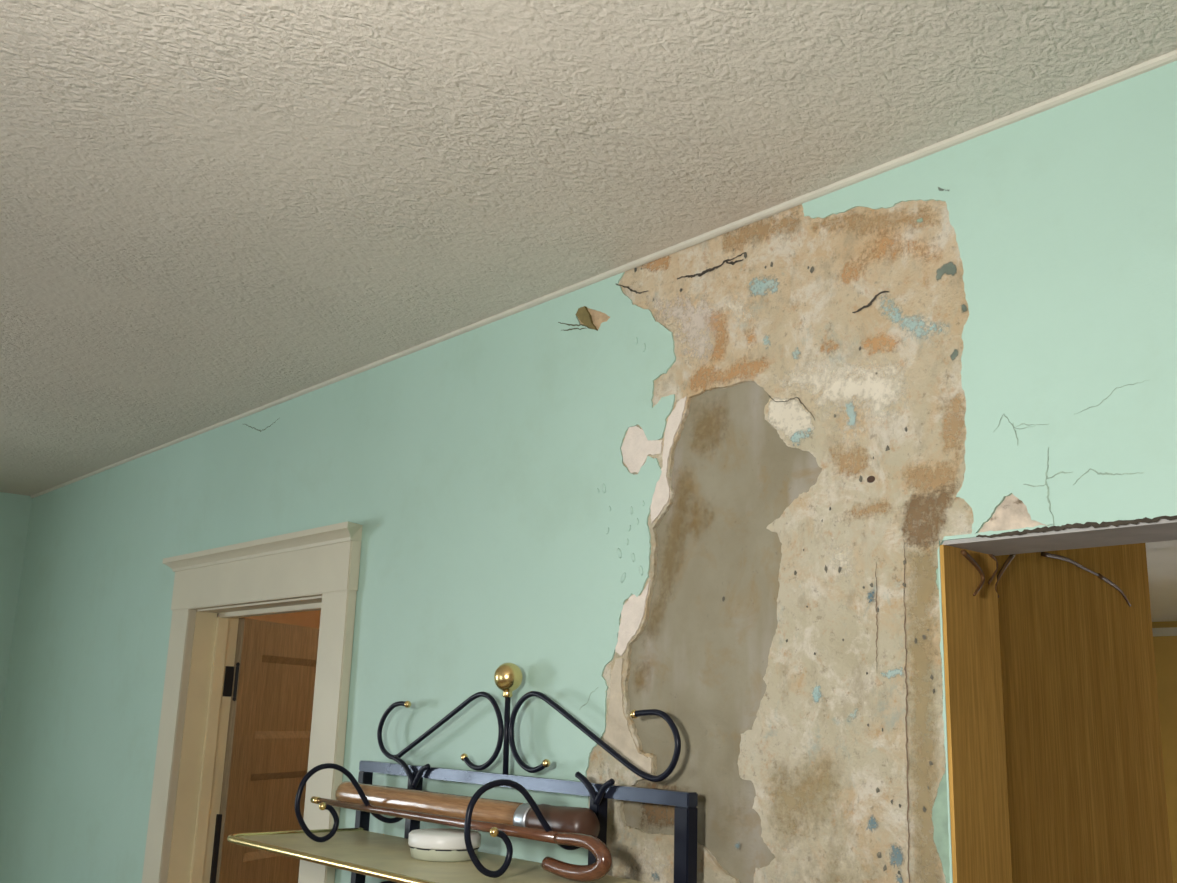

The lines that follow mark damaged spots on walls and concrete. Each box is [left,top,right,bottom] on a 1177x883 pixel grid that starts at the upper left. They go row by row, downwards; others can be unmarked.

peeling [586,188,1048,883]
crack [976,415,1177,538]
water stain [641,803,675,827]